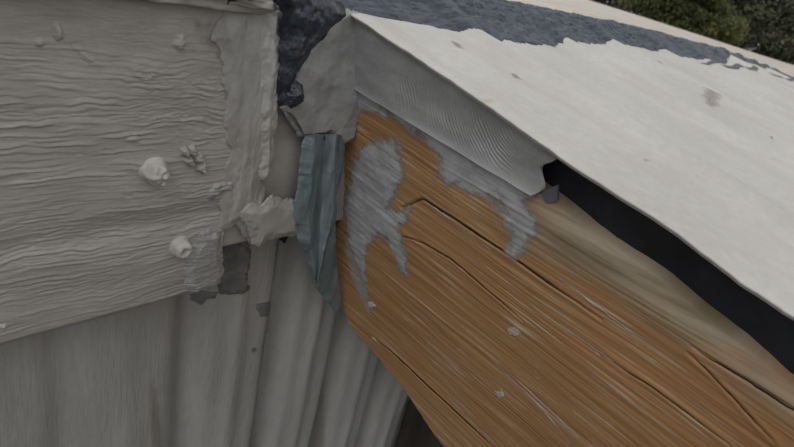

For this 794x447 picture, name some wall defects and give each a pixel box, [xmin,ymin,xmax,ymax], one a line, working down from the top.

peeling [257,10,280,181]
peeling [240,194,297,248]
crack [403,199,598,317]
crack [379,342,493,447]